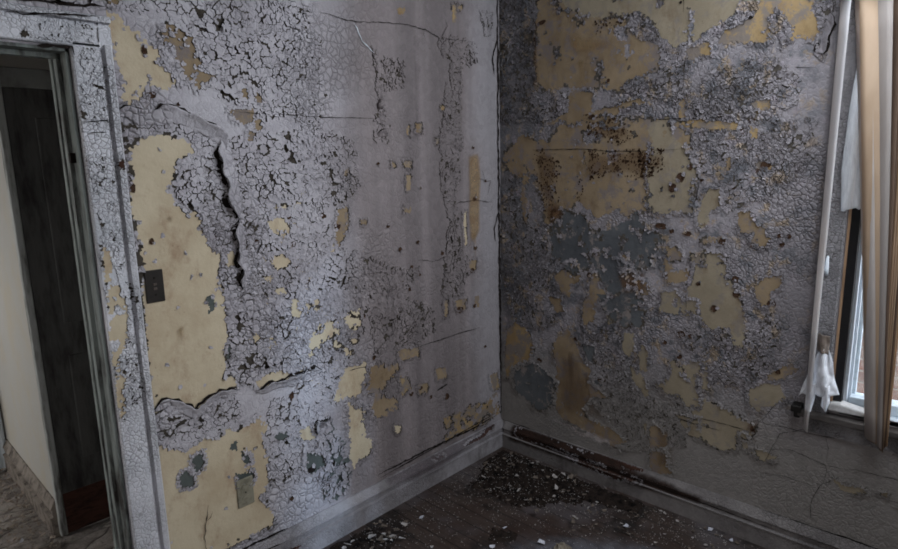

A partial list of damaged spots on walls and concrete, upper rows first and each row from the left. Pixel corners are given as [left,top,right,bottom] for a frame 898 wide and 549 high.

peeling [20,0,480,549]
crack [246,111,370,119]
damp [576,114,665,202]
peeling [431,0,836,486]